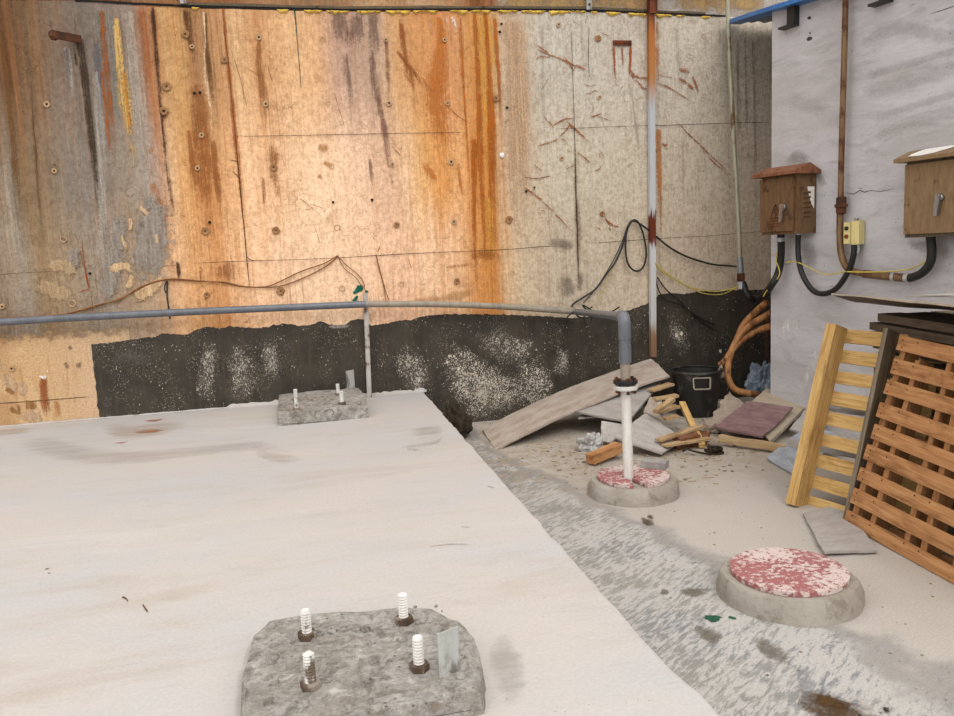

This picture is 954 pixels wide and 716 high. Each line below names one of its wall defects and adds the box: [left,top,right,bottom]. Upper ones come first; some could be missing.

corrosion [187,85,221,215]
corrosion [222,8,242,193]
corrosion [370,17,449,161]
corrosion [450,13,501,271]